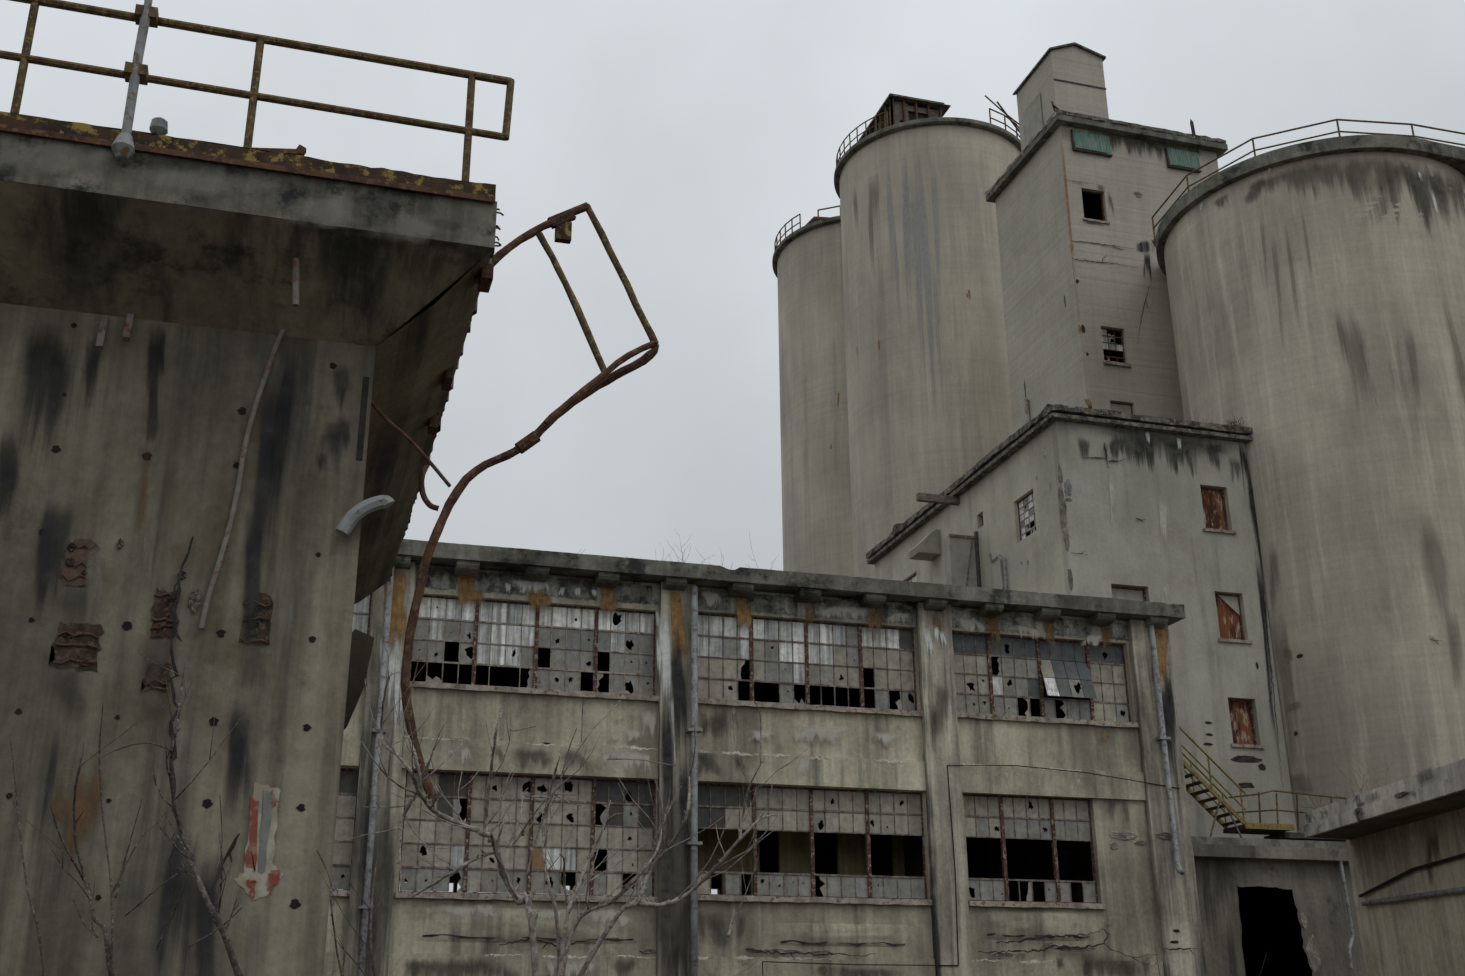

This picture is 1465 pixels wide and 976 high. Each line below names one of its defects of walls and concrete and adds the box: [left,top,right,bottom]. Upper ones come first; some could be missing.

leakage [1248,164,1465,222]
leakage [27,337,99,435]
leakage [245,375,294,639]
rust [49,538,104,703]
rust [141,587,179,711]
rust [239,593,274,675]
leakage [1110,428,1274,720]
crack [168,536,194,891]
leakage [228,714,249,804]
leakage [603,611,745,976]
crack [212,833,240,892]
crack [977,929,1201,964]